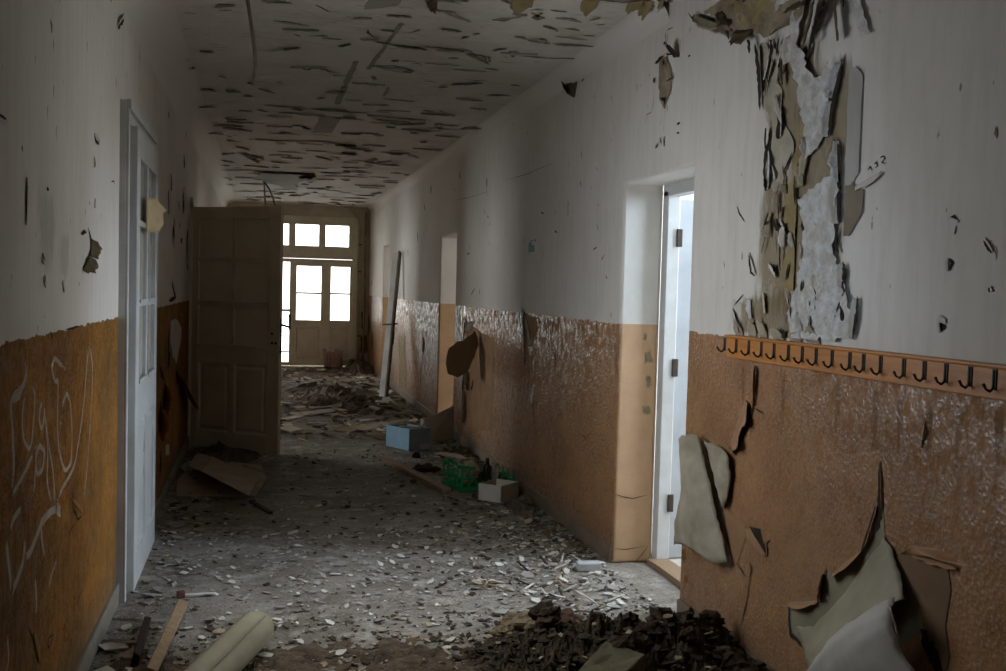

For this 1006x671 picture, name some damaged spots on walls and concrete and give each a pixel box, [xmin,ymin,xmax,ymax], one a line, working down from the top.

peeling [201,0,673,208]
spalling [645,35,690,121]
peeling [688,0,882,344]
peeling [81,228,102,274]
peeling [446,320,494,432]
peeling [674,433,770,564]
peeling [785,464,958,671]